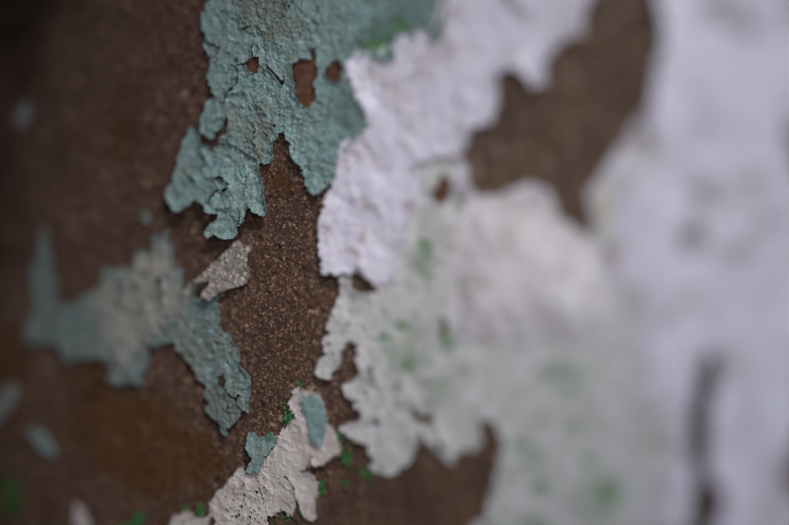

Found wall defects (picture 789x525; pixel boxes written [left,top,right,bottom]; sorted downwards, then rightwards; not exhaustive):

peeling [24,228,252,437]
peeling [165,0,789,525]
peeling [73,503,91,525]